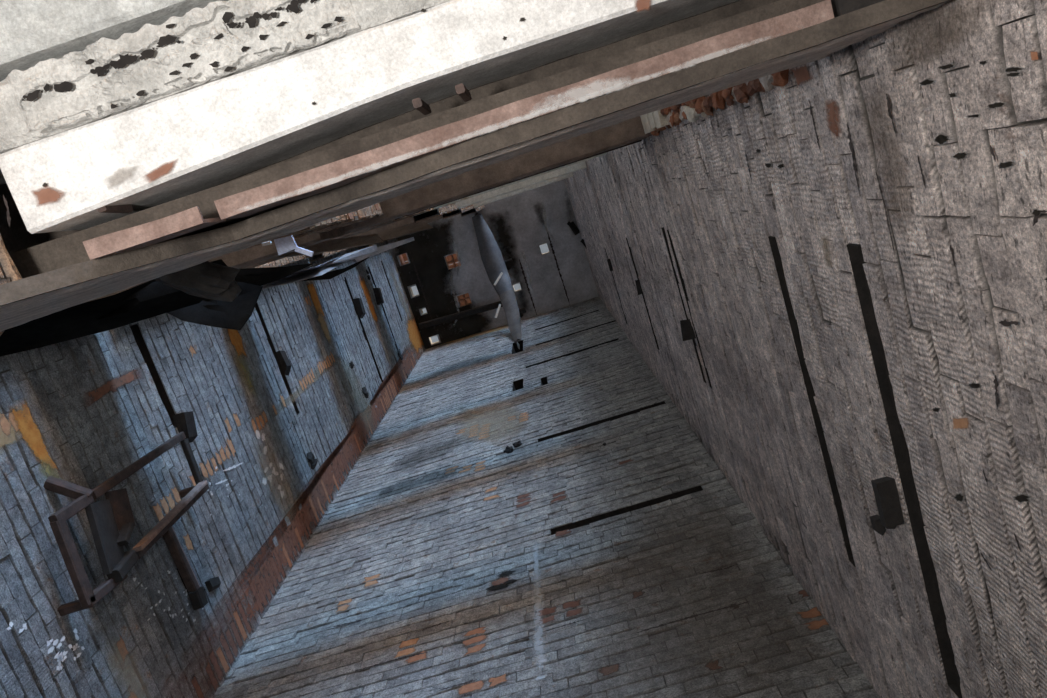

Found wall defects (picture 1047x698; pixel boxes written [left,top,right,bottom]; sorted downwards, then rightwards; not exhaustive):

spalling [6,0,362,139]
spalling [640,69,789,136]
leakage [490,216,529,309]
crack [999,319,1020,327]
crack [992,375,1000,409]
peeling [0,412,19,447]
peeling [133,345,427,698]
peeling [462,627,487,656]